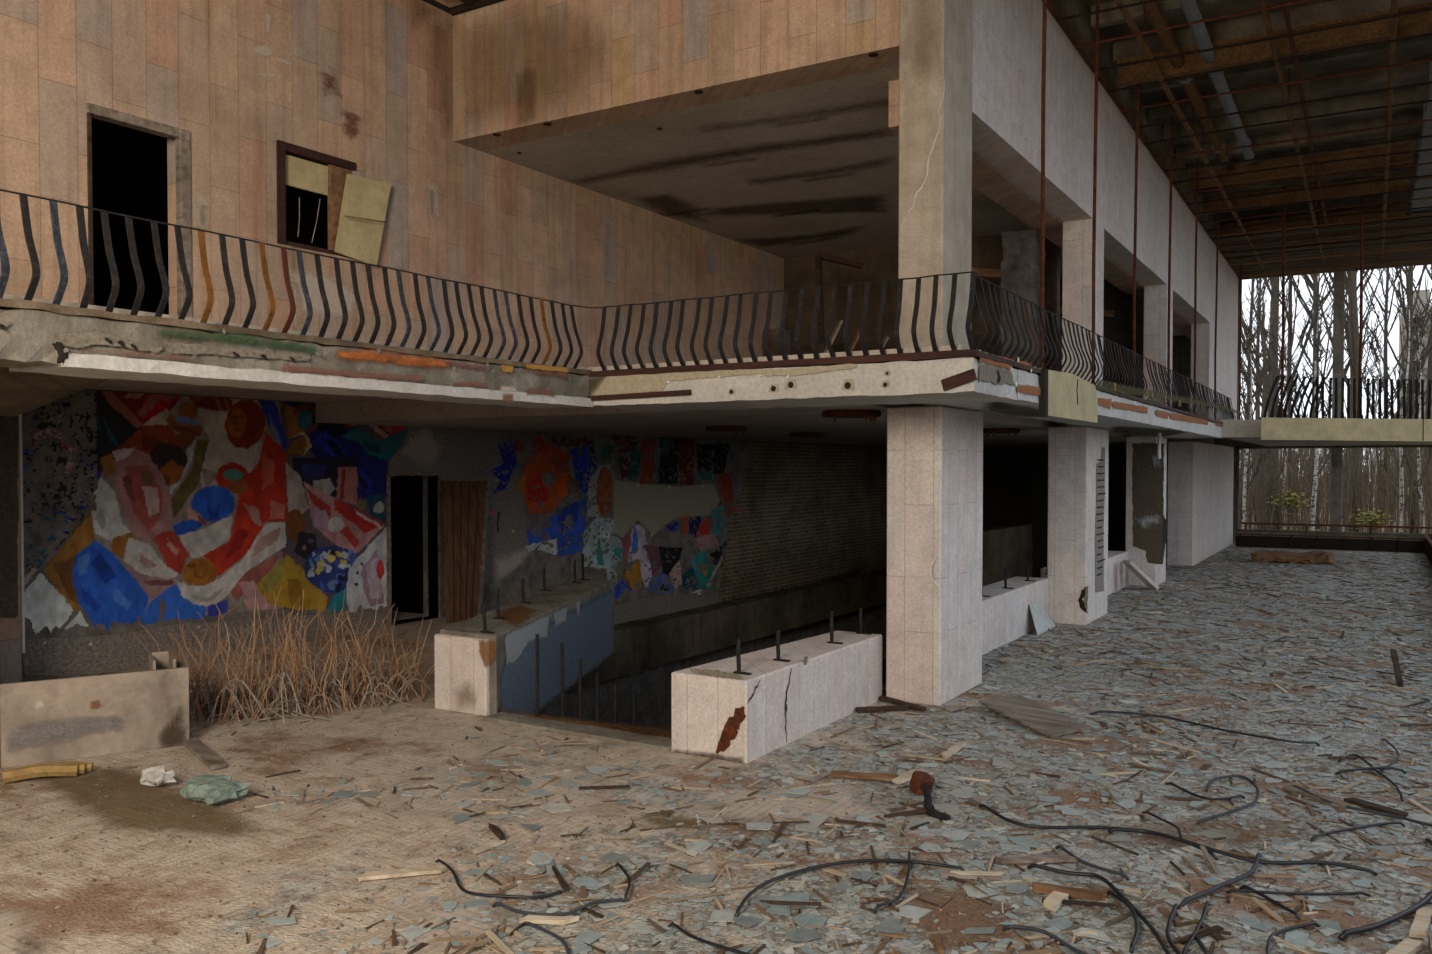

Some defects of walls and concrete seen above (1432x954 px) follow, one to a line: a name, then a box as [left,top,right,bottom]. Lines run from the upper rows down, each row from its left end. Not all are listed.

leakage [584,131,883,182]
crack [900,86,945,229]
leakage [644,196,883,246]
spalling [56,328,572,398]
peeling [589,363,857,396]
spalling [979,350,1041,395]
flaking render [499,441,887,715]
crack [716,668,792,753]